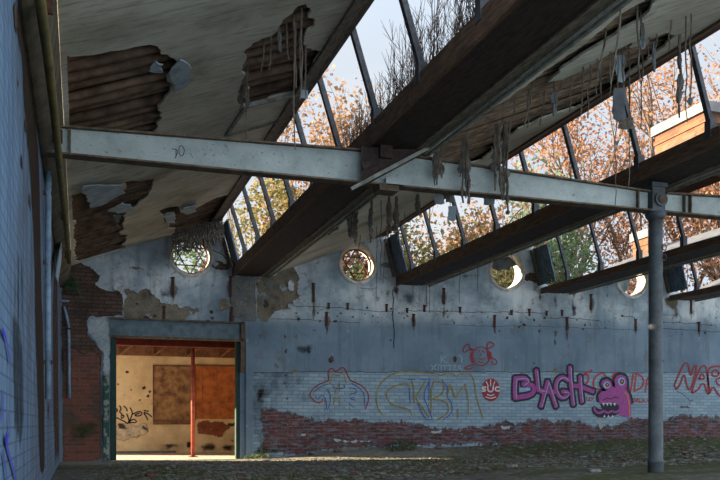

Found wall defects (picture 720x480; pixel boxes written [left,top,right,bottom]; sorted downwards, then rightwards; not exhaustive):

flaking render [676,55,693,105]
peeling [14,3,199,472]
peeling [258,408,648,455]
peeling [663,405,720,438]